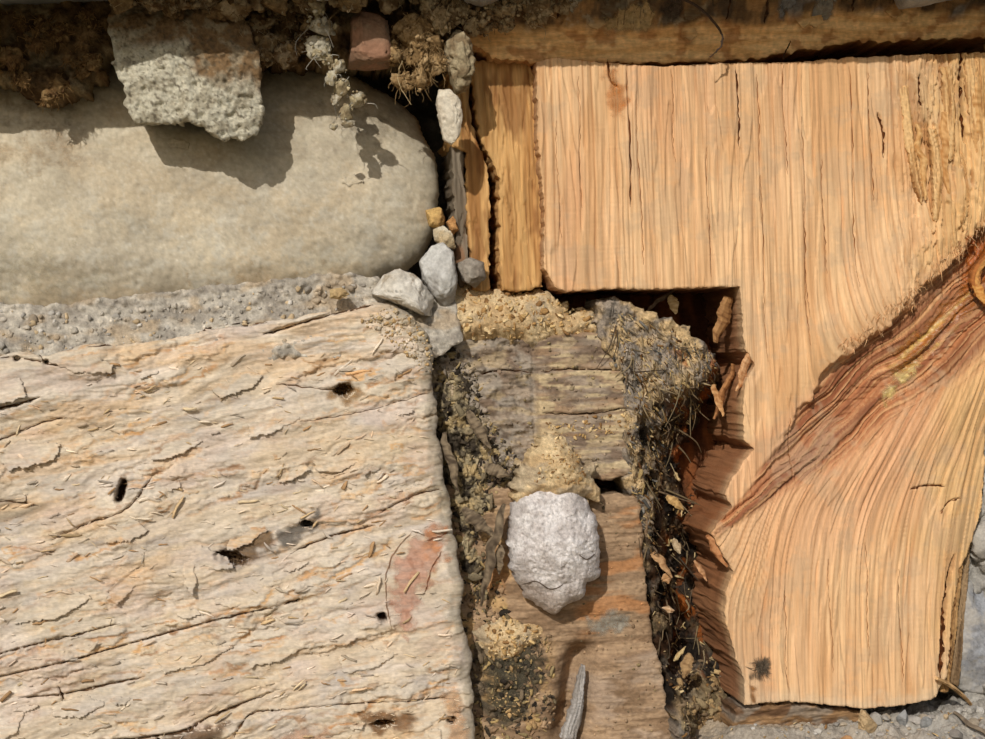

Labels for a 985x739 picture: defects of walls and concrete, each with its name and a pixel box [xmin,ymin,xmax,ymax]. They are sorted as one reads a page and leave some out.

crack [197,305,371,335]
crack [1,355,58,366]
crack [0,397,65,440]
crack [277,382,332,390]
crack [307,392,430,421]
crack [52,477,152,540]
crack [290,489,443,554]
crack [385,532,448,629]
crack [938,561,974,678]
crack [0,599,299,699]
crack [129,689,455,739]